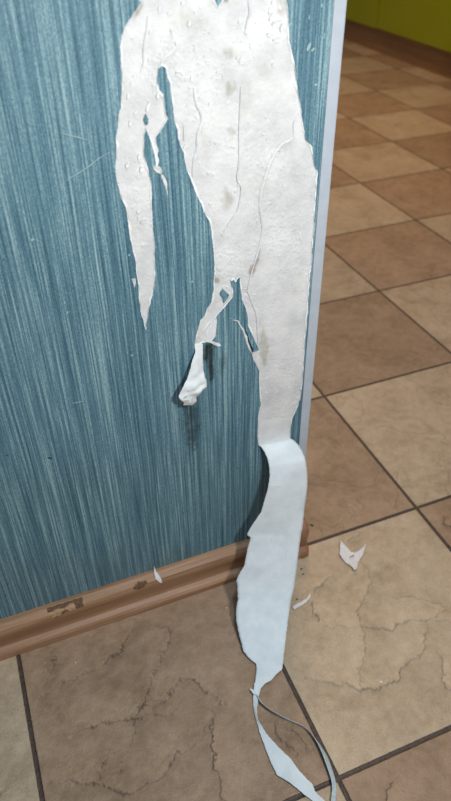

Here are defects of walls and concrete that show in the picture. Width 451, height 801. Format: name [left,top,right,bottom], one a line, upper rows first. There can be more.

peeling [115,0,318,438]